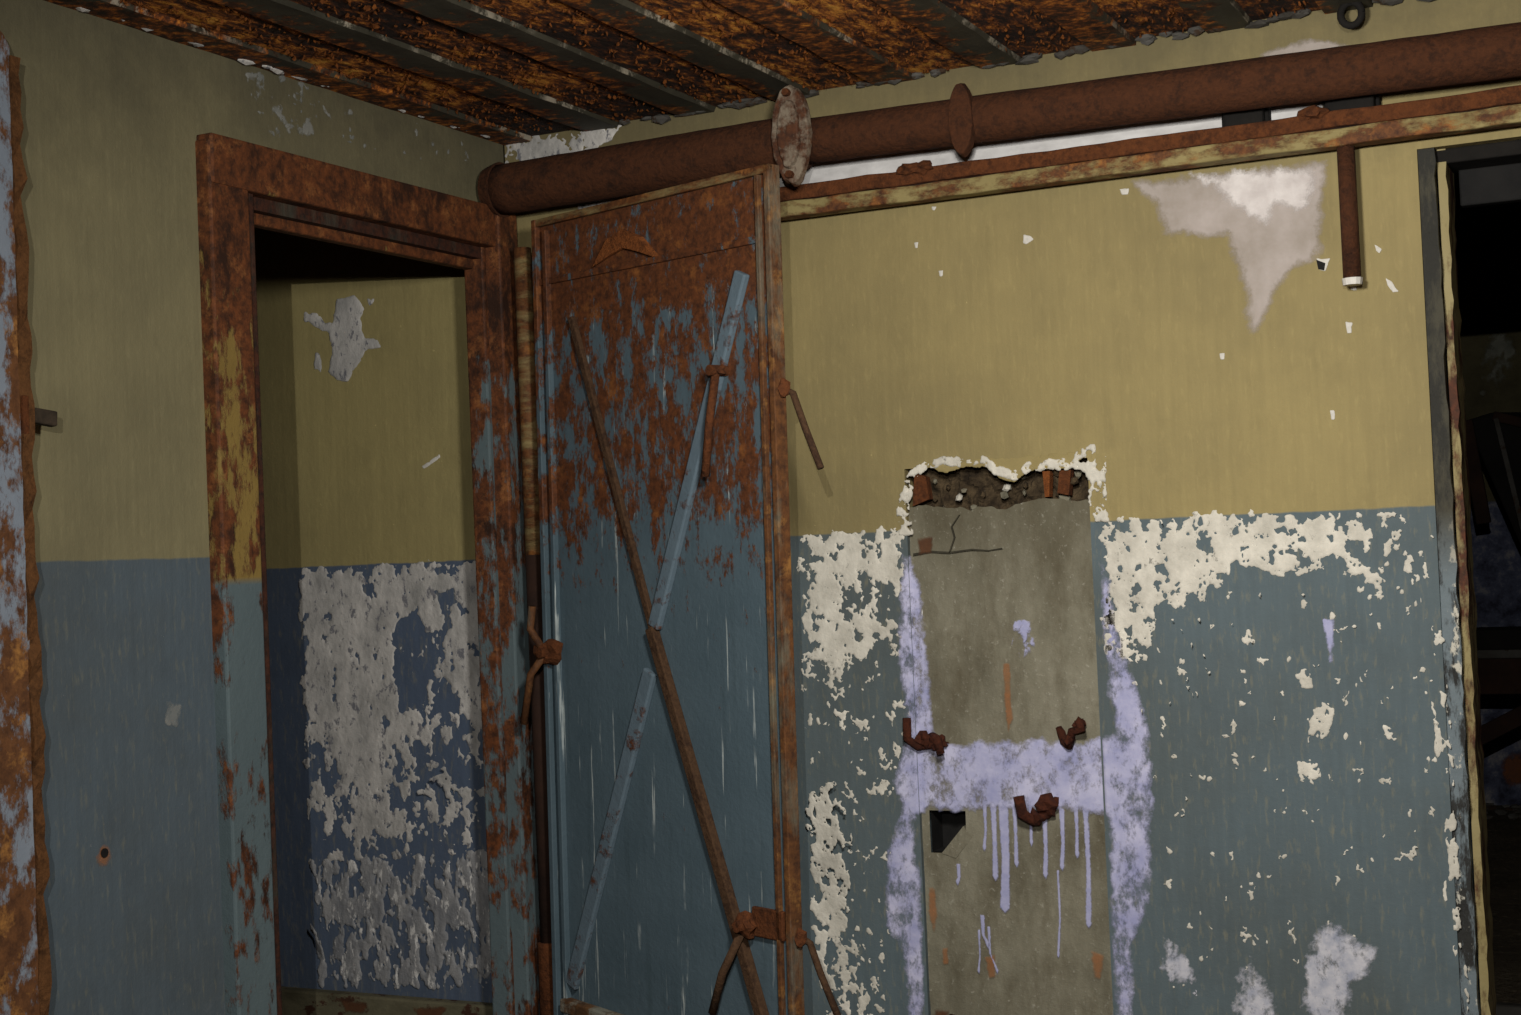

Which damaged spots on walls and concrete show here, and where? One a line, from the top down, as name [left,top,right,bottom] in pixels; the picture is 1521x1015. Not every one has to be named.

corrosion [120,0,553,133]
corrosion [310,0,667,121]
corrosion [492,0,752,103]
corrosion [938,0,1070,54]
corrosion [592,229,658,268]
peeling [304,295,381,382]
peeling [298,560,491,990]
spalling [797,444,1434,1015]
peeling [1413,626,1454,786]
leakage [978,915,998,973]
leakage [983,798,1091,957]
peeling [1394,806,1469,1011]